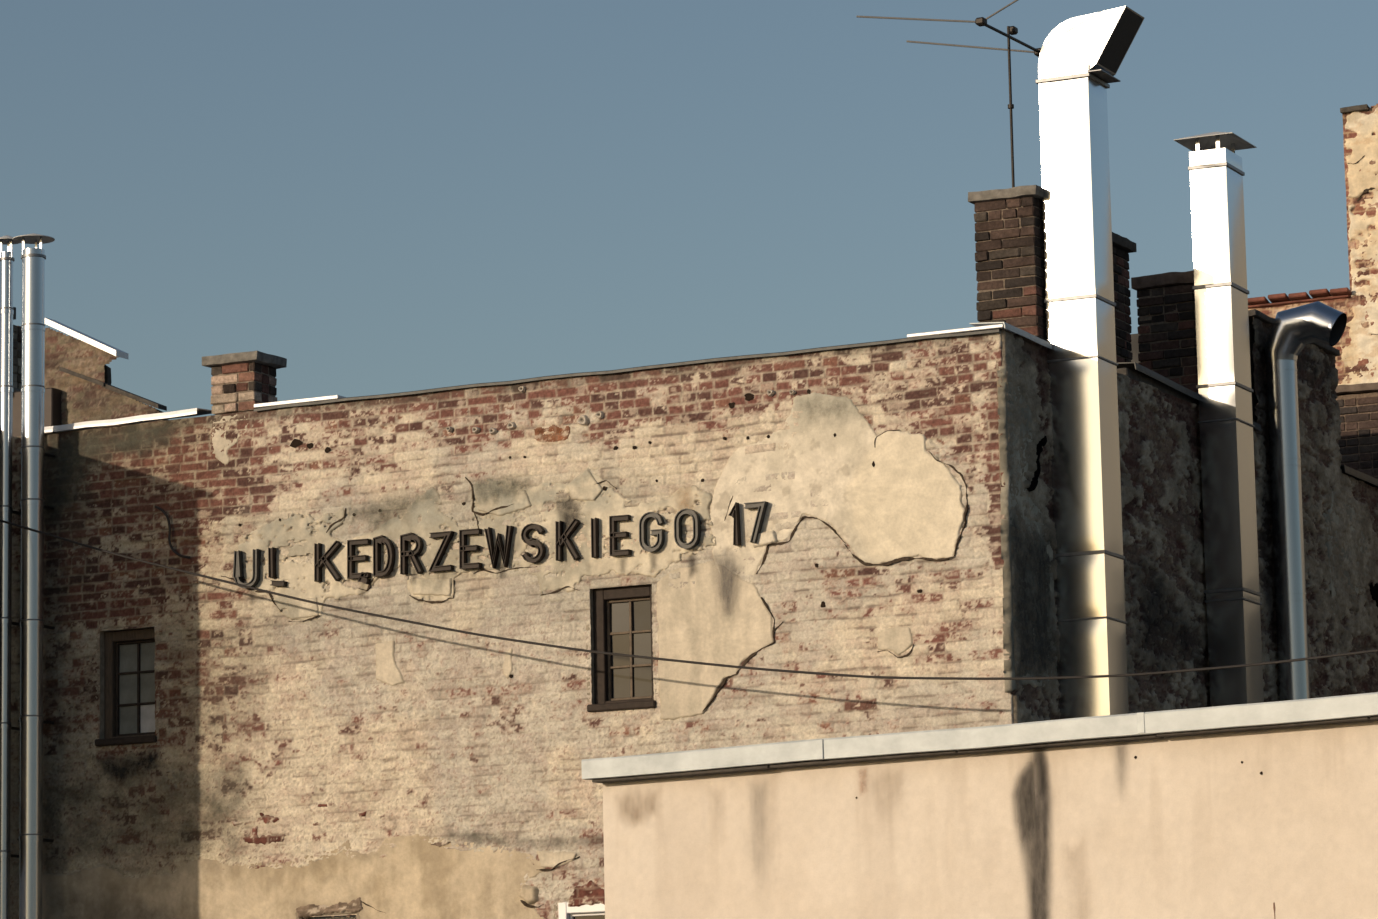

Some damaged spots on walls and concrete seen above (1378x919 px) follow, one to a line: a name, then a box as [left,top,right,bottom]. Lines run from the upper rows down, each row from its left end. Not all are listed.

flaking render [237,392,965,720]